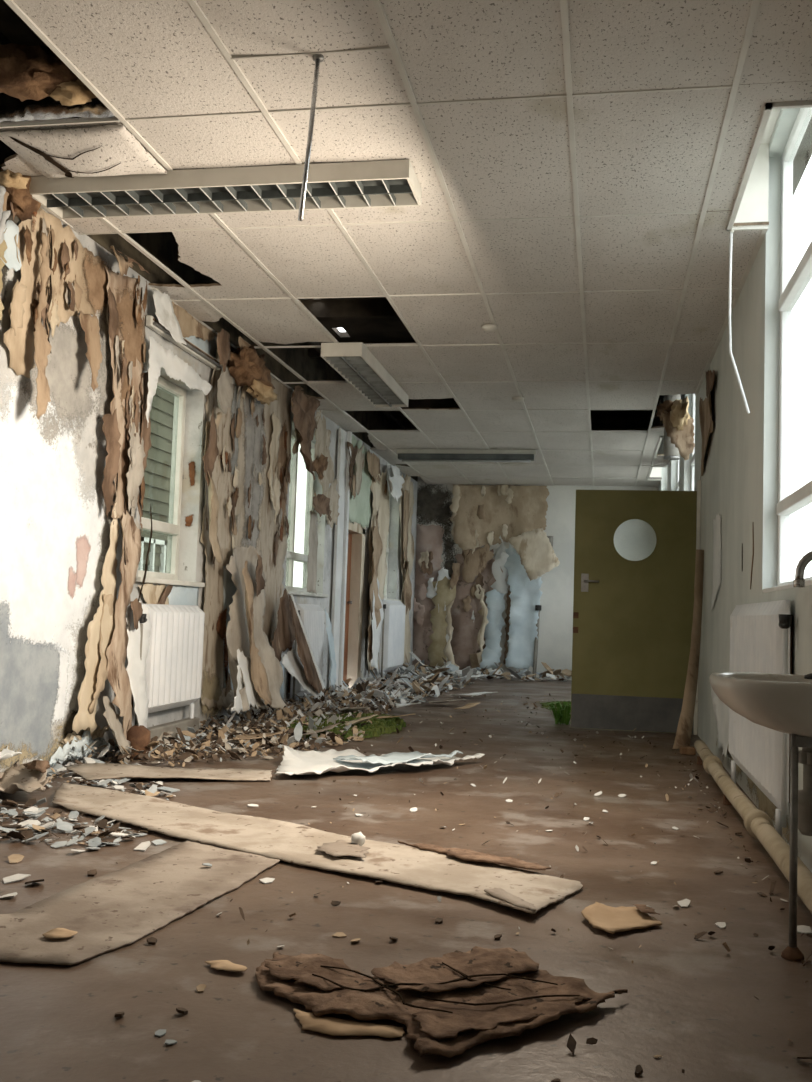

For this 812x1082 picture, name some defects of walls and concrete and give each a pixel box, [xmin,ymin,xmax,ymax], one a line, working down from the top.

crack [10,136,74,178]
peeling [0,185,33,320]
peeling [32,229,78,338]
peeling [222,396,290,549]
peeling [347,435,387,528]
peeling [68,536,91,598]
peeling [274,516,289,566]
peeling [412,524,543,670]